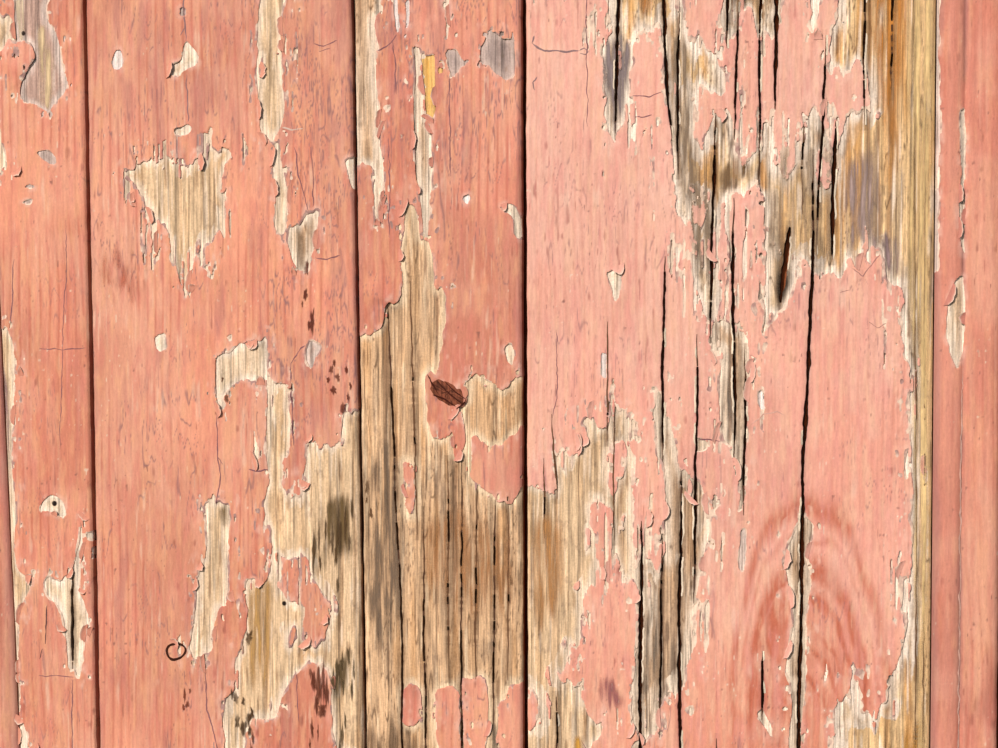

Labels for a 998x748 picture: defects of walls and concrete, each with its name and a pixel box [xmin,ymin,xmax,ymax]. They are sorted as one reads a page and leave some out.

peeling [0,129,22,186]
peeling [0,0,72,120]
peeling [37,150,56,165]
peeling [111,50,124,70]
peeling [112,124,248,298]
peeling [2,315,96,748]
peeling [168,0,966,748]
crack [606,321,615,540]
crack [638,0,880,748]
crack [863,0,926,748]